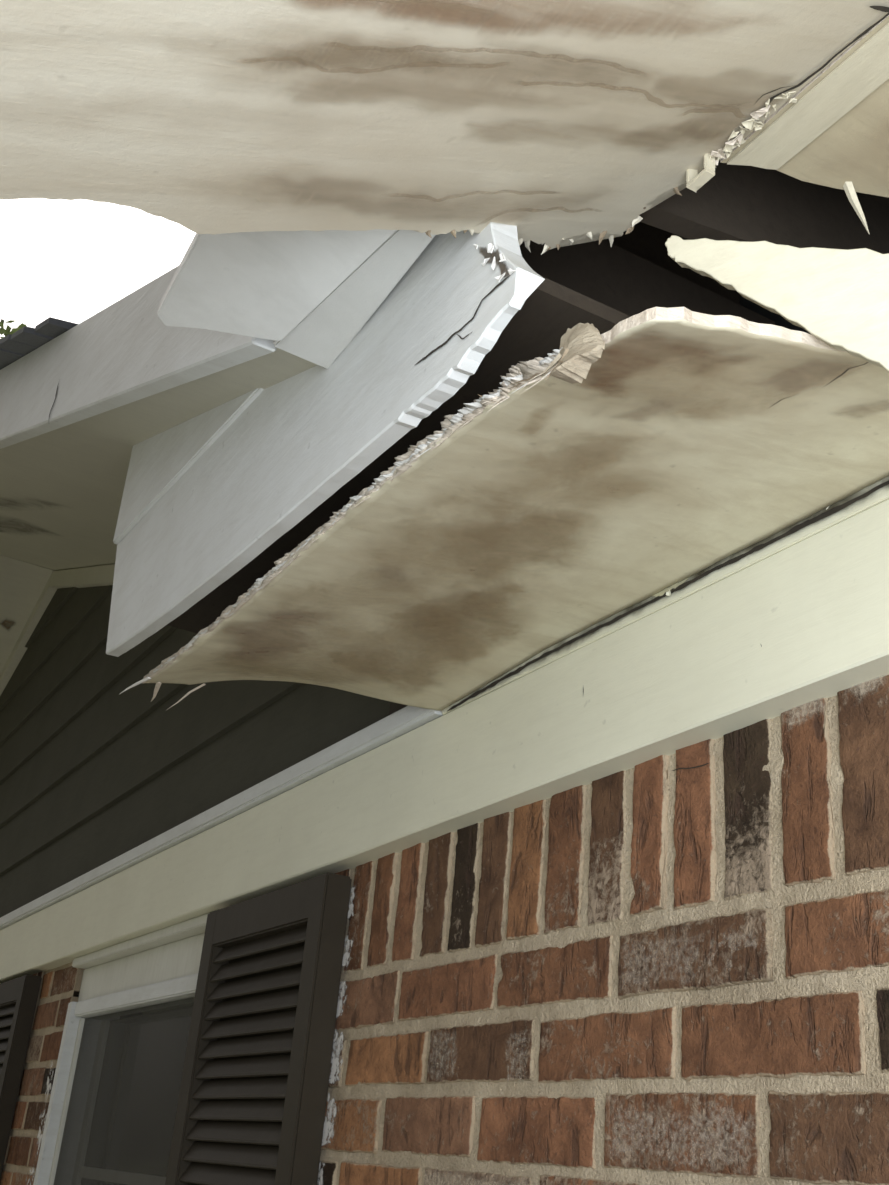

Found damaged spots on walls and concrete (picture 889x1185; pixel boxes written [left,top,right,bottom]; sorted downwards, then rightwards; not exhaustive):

peeling [473,243,516,282]
crack [414,276,509,366]
damp [692,494,856,579]
crack [448,481,889,711]